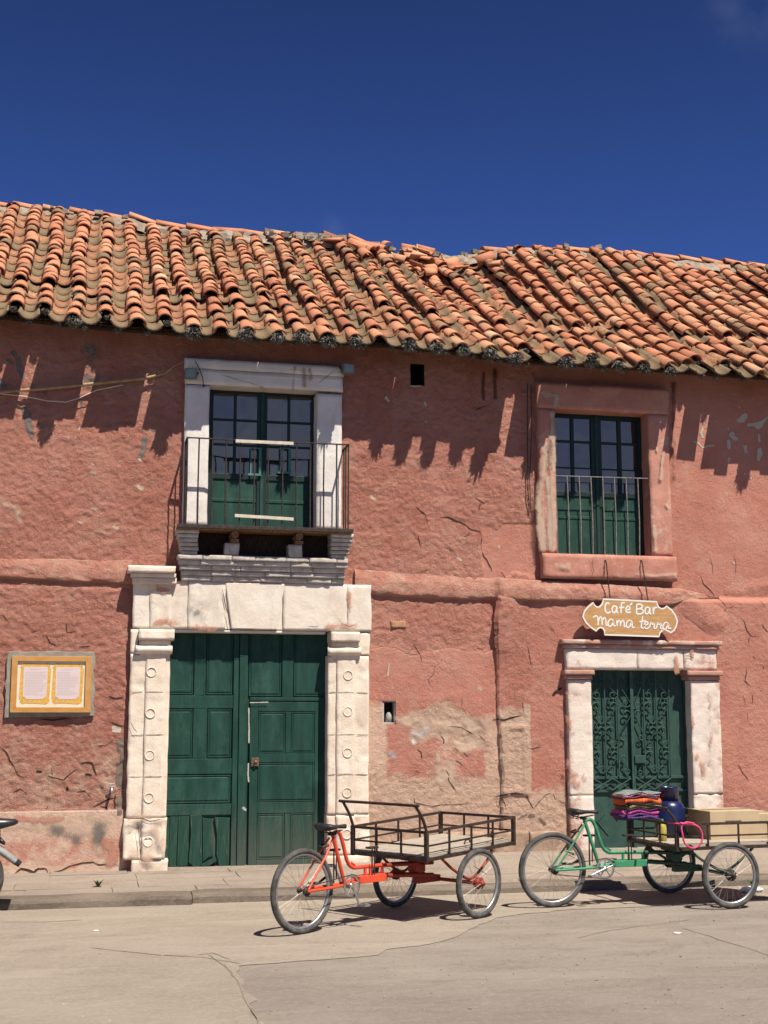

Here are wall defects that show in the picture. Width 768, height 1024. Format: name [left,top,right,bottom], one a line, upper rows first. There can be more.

peeling [691,406,768,462]
crack [416,507,505,577]
crack [2,696,160,873]
flaking render [396,716,489,785]
leakage [14,814,119,866]
crack [92,947,260,1024]